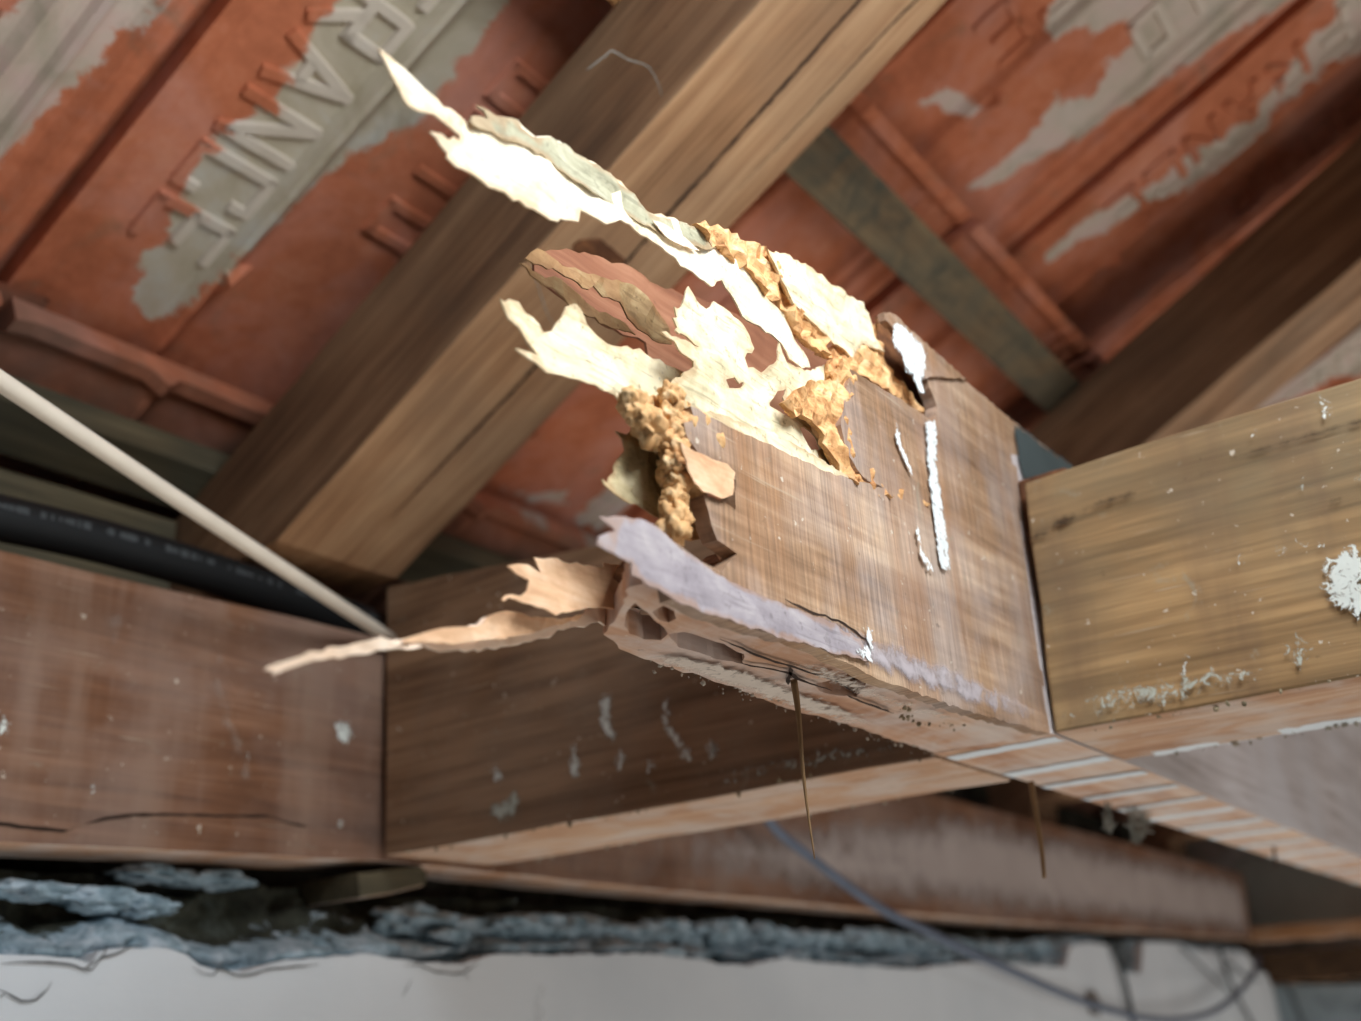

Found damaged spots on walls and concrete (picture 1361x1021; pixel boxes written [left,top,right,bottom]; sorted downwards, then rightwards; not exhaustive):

peeling [679,442,735,499]
peeling [501,516,869,662]
crack [0,813,313,833]
spalling [0,863,1242,973]